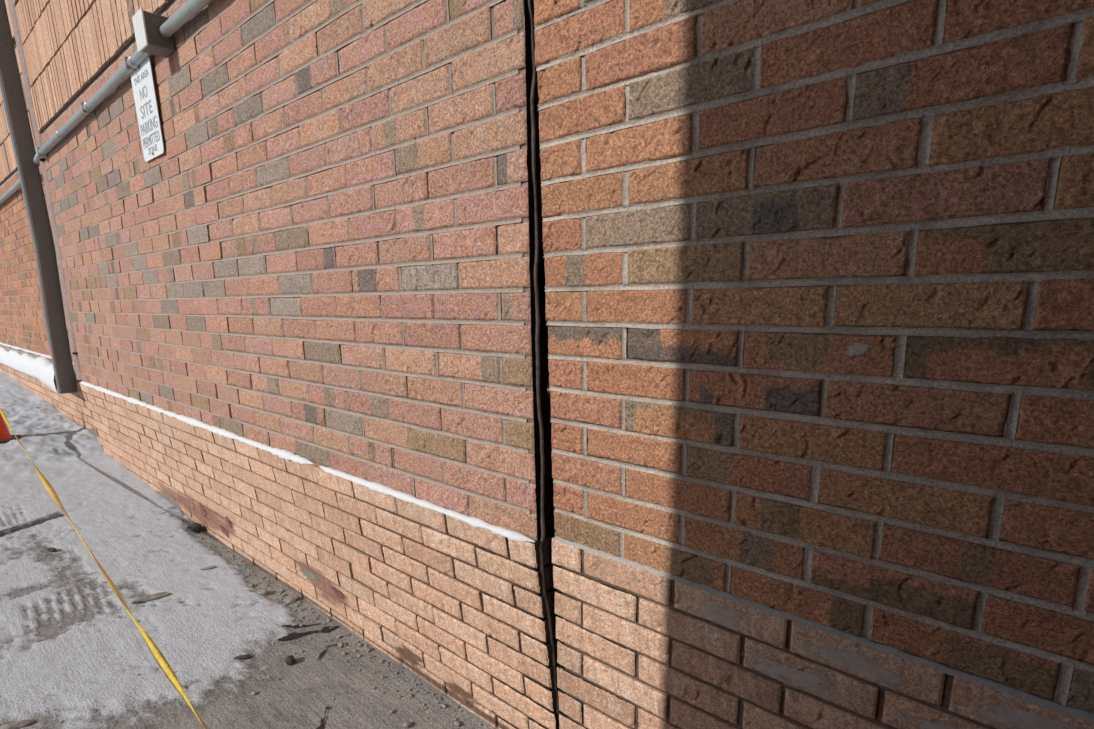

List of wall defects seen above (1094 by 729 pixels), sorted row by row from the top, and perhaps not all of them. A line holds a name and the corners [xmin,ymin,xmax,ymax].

crack [524,0,560,720]